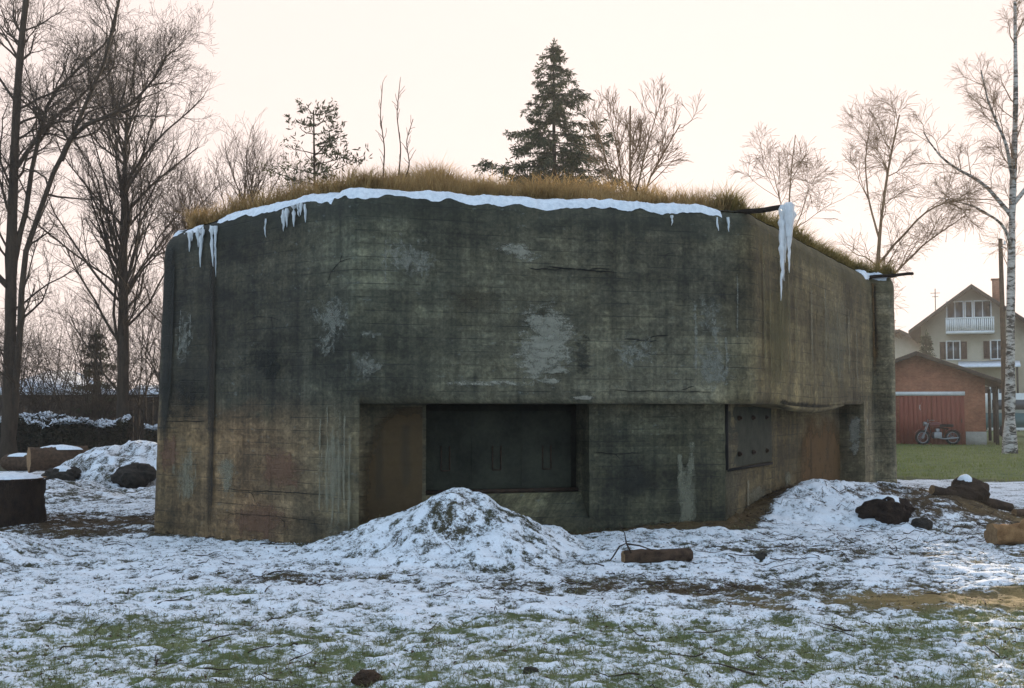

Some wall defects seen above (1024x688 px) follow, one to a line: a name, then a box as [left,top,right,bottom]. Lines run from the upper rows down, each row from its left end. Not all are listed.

crack [528,265,617,273]
peeling [511,306,575,384]
water stain [678,442,695,522]